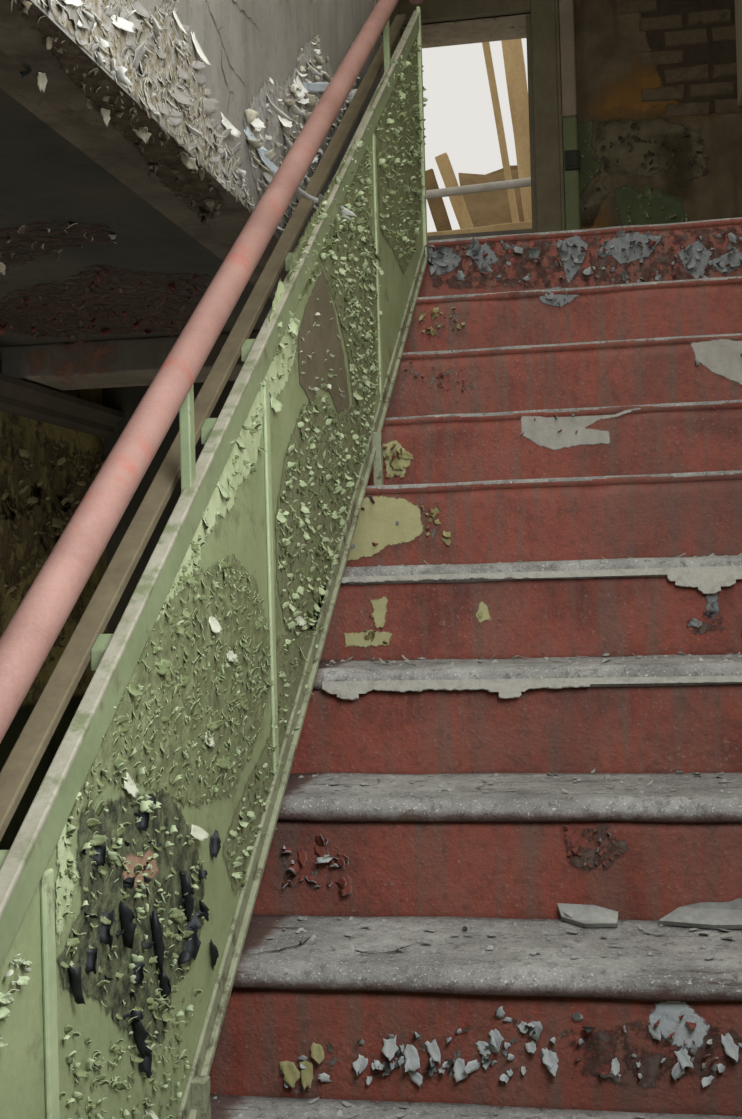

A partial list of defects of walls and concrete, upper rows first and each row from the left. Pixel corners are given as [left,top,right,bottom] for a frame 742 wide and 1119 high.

flaking render [11,0,334,226]
flaking render [0,265,210,342]
flaking render [691,339,742,385]
flaking render [521,408,641,450]
peeling [0,433,105,637]
peeling [27,596,86,694]
peeling [56,36,451,1119]
flaking render [322,675,742,700]
flaking render [341,566,742,634]
peeling [563,825,628,873]
peeling [0,954,32,1047]
peeling [279,1001,742,1094]